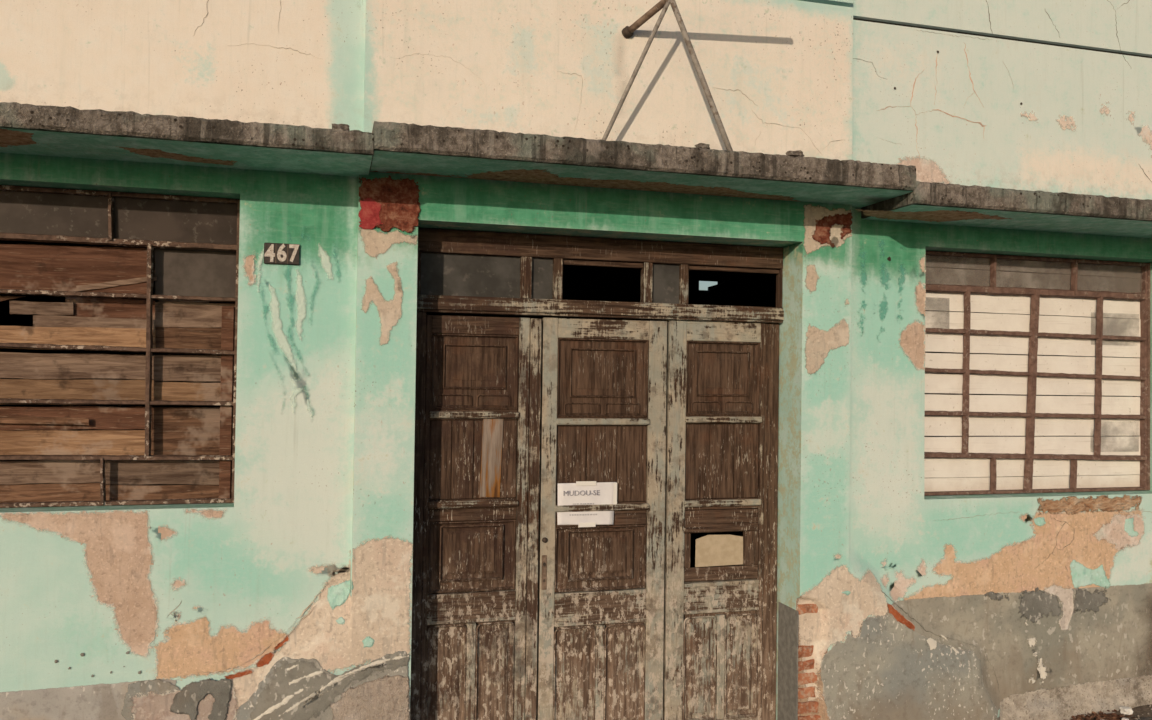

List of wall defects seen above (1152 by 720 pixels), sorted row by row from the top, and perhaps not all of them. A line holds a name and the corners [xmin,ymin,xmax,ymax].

rust [0,128,37,147]
rust [116,146,237,166]
leakage [257,247,339,412]
peeling [359,228,418,345]
rust [356,169,797,233]
peeling [805,319,849,374]
peeling [803,204,852,291]
peeling [899,252,926,371]
crack [877,1,993,157]
spalling [0,508,413,720]
peeling [796,495,1146,720]